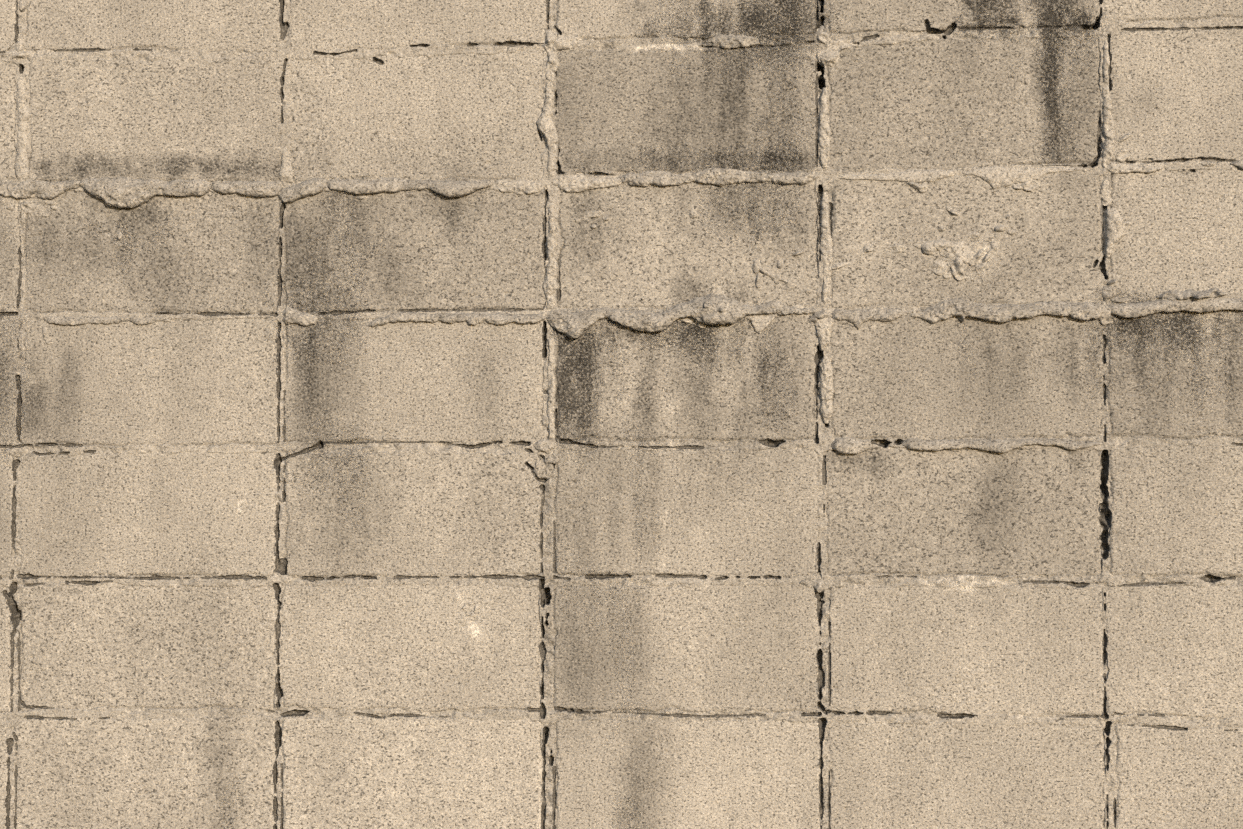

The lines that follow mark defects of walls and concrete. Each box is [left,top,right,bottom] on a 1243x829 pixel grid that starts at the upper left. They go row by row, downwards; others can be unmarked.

water stain [632,0,815,53]
water stain [964,0,1020,28]
water stain [1035,0,1090,155]
water stain [555,335,596,440]